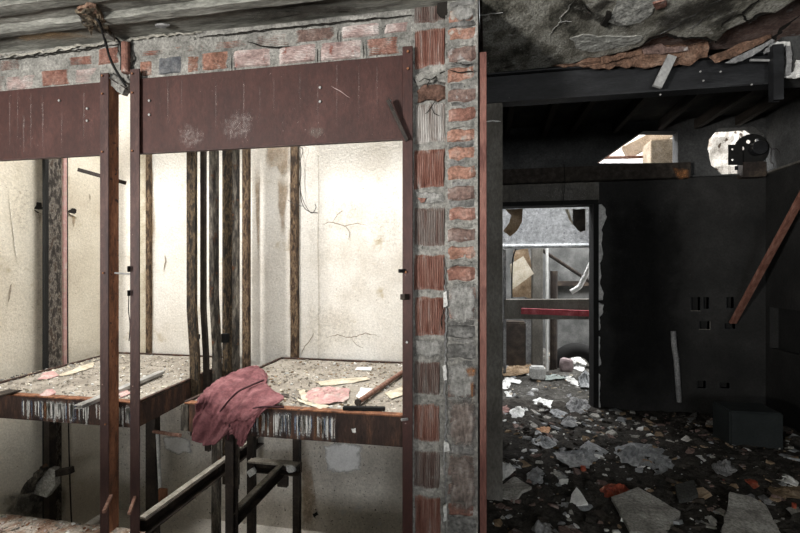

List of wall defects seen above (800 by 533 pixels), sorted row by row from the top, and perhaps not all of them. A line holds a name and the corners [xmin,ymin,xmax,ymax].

crack [0,15,412,69]
spalling [553,0,800,79]
crack [419,62,474,116]
crack [318,203,364,236]
crack [301,311,378,358]